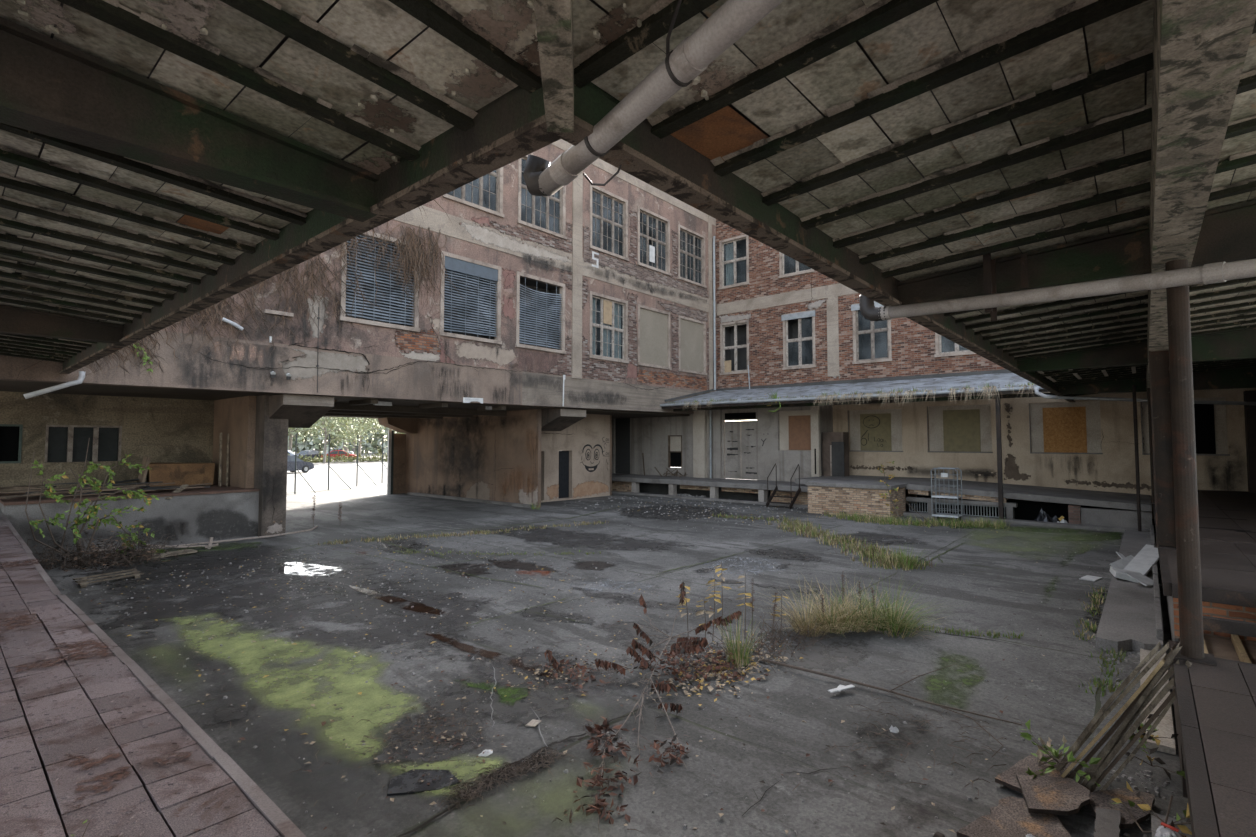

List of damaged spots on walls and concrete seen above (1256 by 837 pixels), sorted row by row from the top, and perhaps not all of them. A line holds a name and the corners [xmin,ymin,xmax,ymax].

flaking render [354,92,416,134]
crack [192,291,561,390]
flaking render [394,315,519,367]
flaking render [972,403,1031,481]